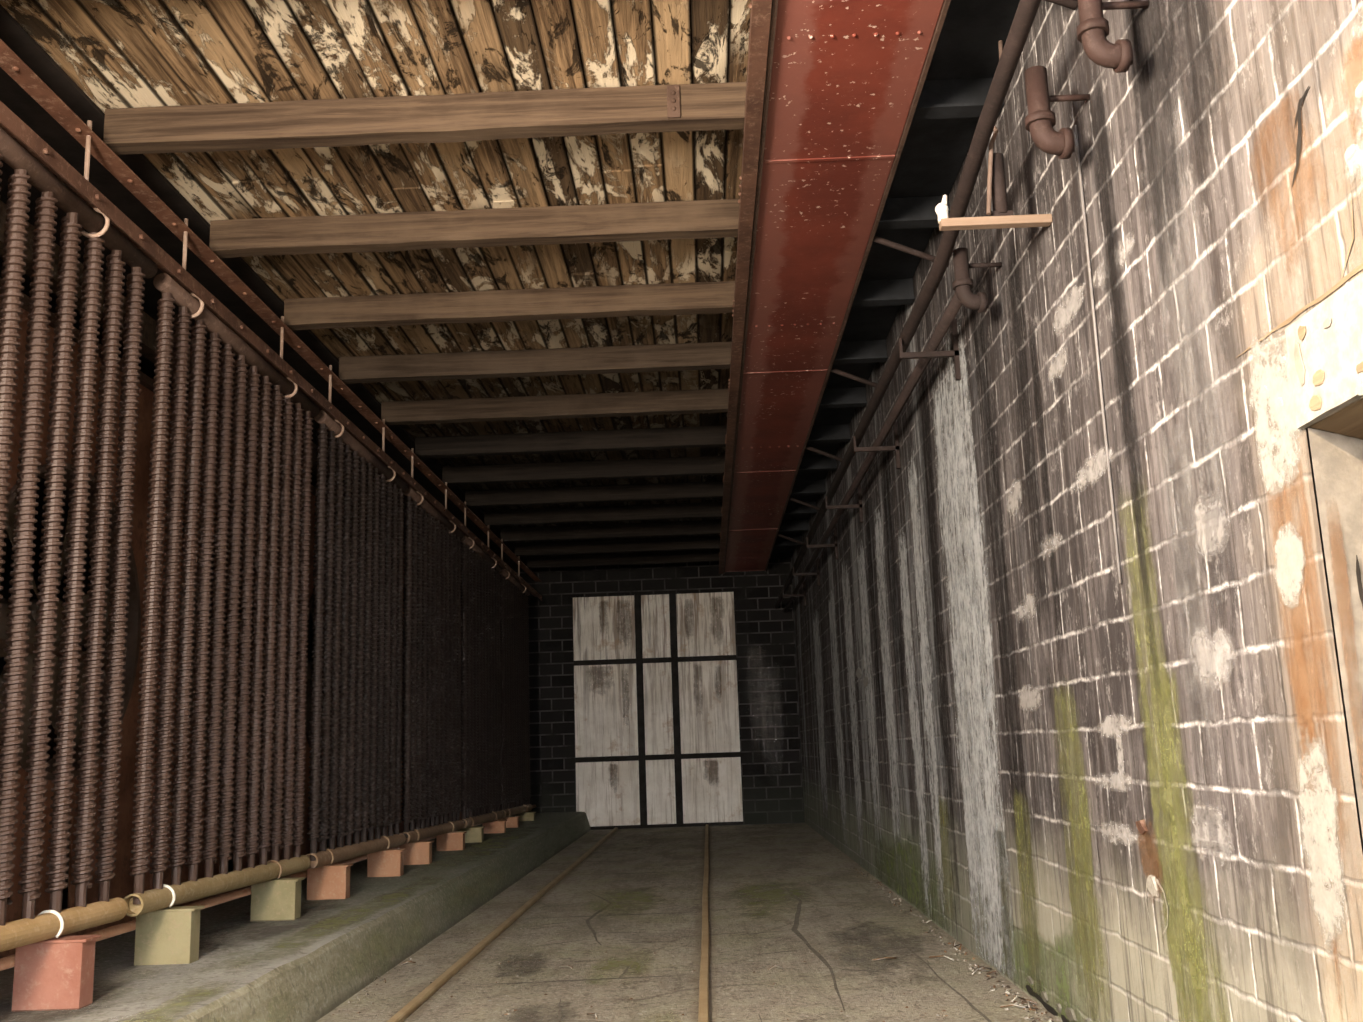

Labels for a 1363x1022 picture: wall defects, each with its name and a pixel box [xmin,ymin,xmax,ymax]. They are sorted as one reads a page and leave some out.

peeling [1342,22,1363,189]
leakage [813,91,1232,1022]
crack [733,882,992,1022]